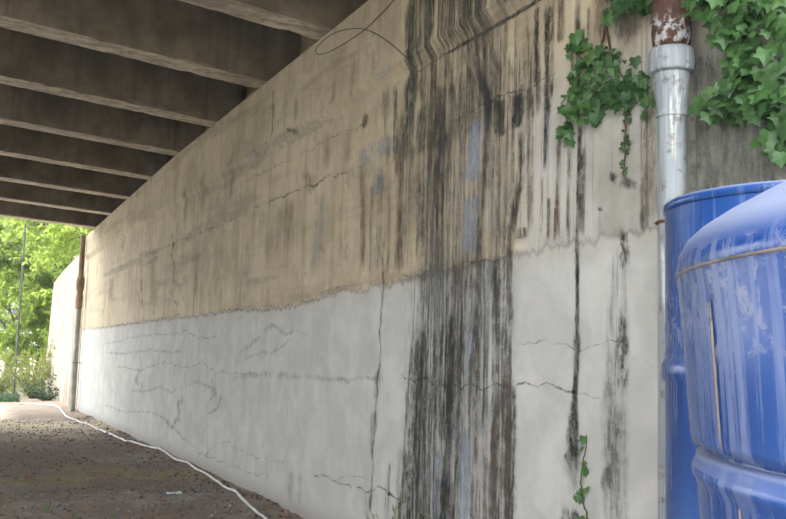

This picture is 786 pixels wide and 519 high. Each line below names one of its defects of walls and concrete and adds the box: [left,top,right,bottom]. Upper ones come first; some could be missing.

leakage [360,0,554,519]
leakage [565,111,585,470]
leakage [605,309,628,516]
leakage [692,110,776,190]